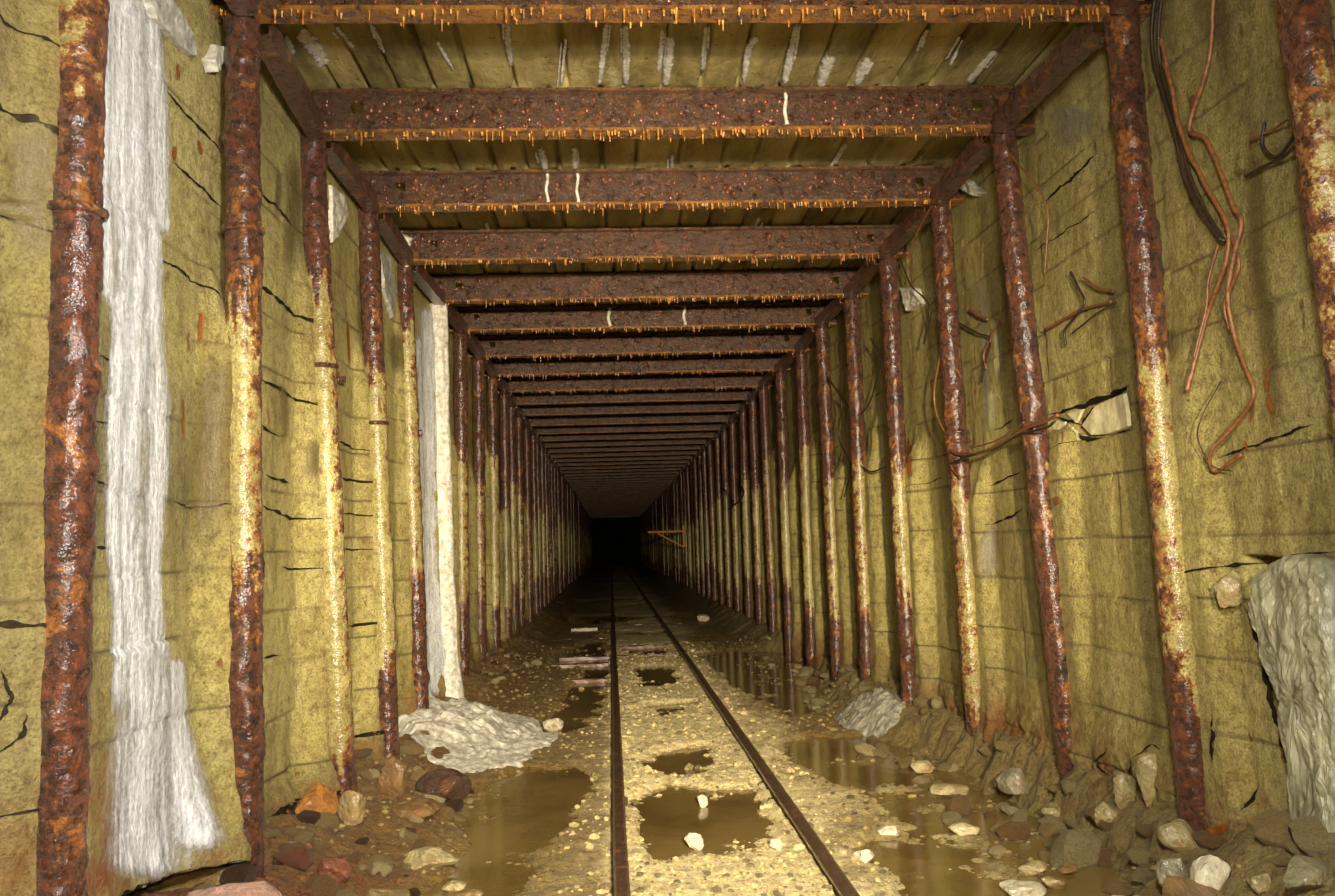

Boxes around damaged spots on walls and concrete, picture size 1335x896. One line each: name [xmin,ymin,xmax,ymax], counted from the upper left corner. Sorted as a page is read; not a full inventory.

rust [586,0,1110,31]
rust [323,94,993,150]
rust [370,173,956,217]
crack [262,286,314,323]
rust [413,230,896,394]
damp [102,0,226,875]
damp [192,367,233,518]
damp [392,303,558,773]
crack [0,620,47,628]
crack [1184,551,1335,768]
crack [0,670,28,752]
damp [834,687,905,738]